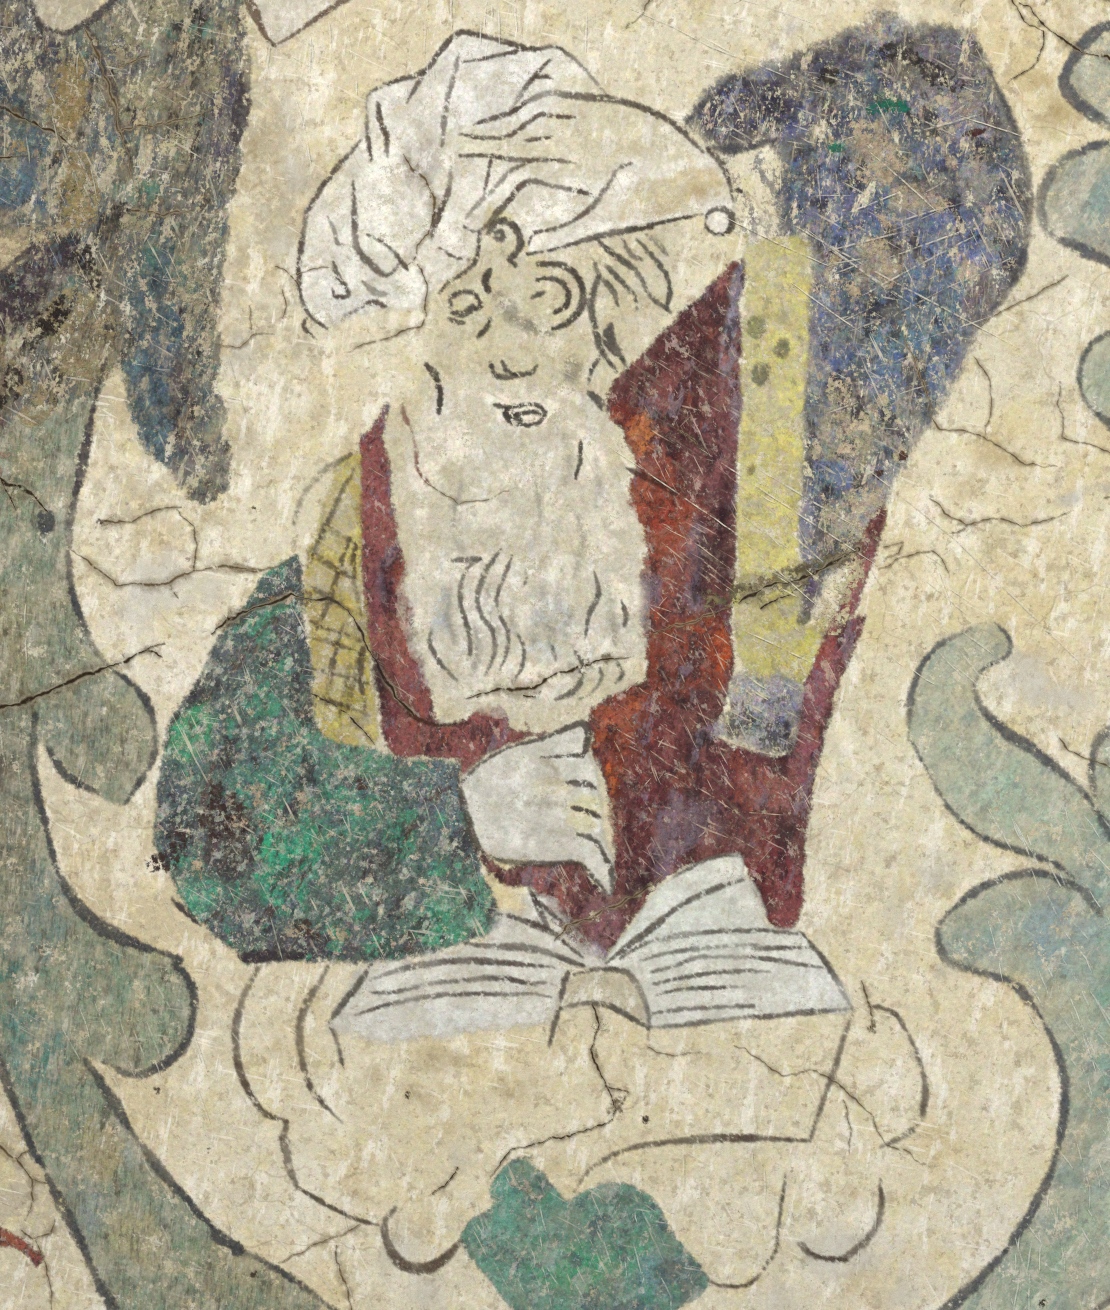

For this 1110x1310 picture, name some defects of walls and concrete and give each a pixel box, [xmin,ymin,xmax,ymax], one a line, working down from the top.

crack [1008,0,1110,82]
crack [905,275,1110,467]
crack [68,499,1072,726]
crack [0,643,165,712]
crack [310,693,374,743]
crack [490,1005,629,1177]
crack [734,1045,920,1163]
crack [430,1167,458,1195]